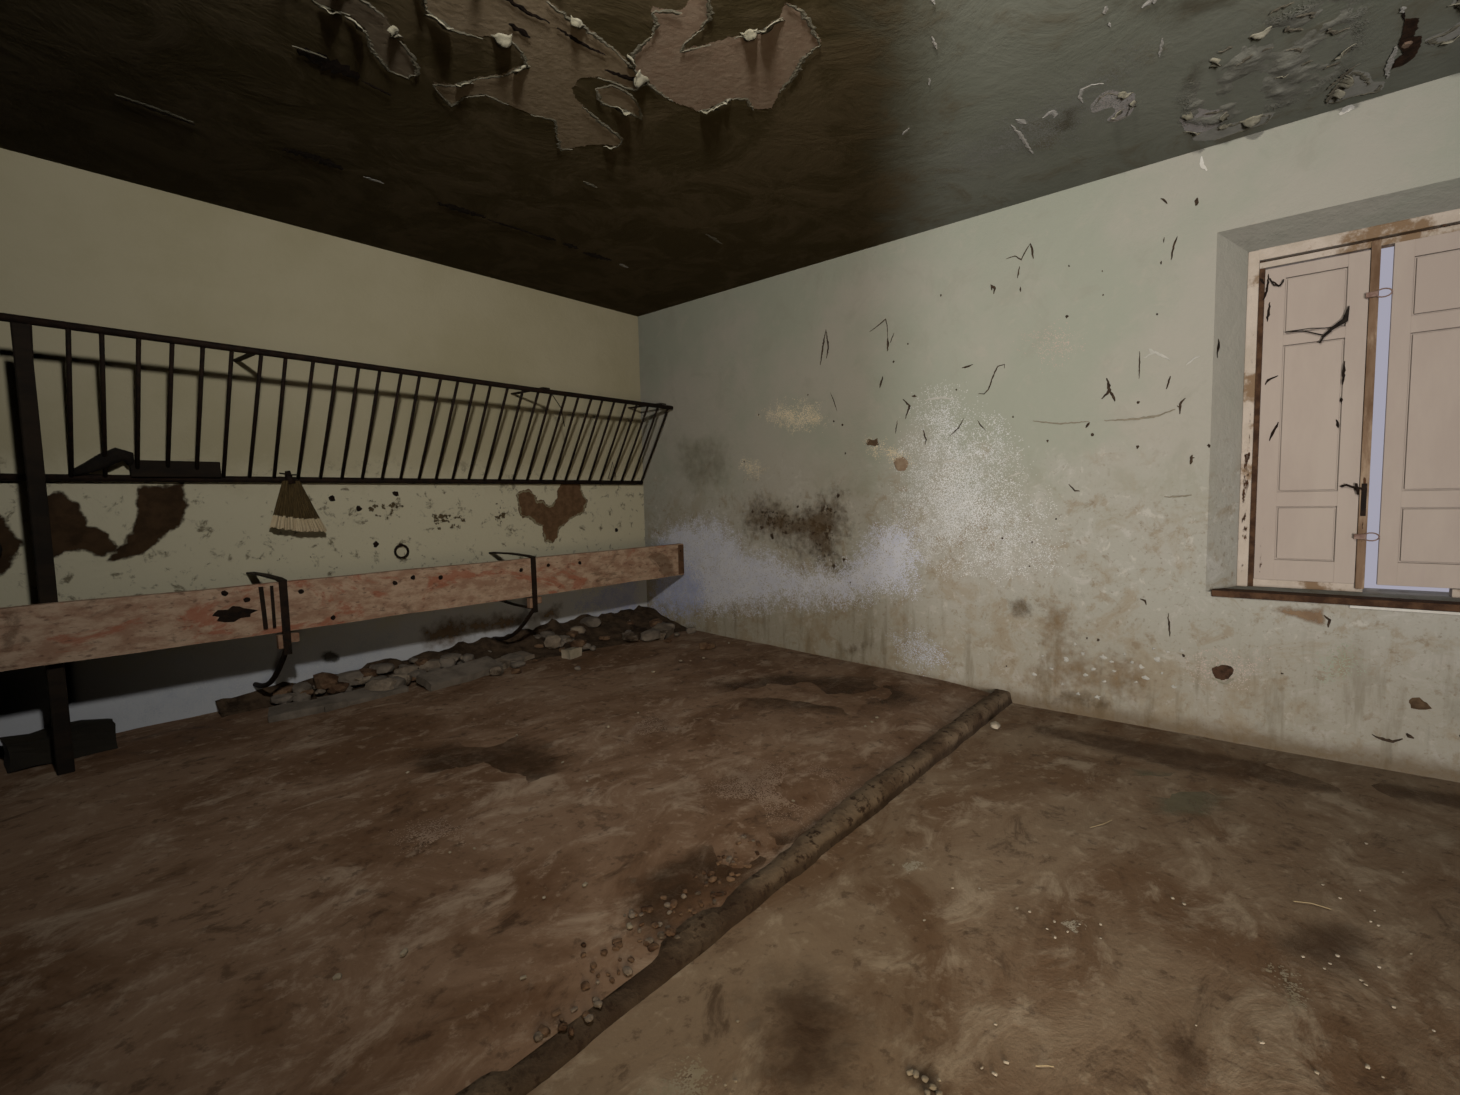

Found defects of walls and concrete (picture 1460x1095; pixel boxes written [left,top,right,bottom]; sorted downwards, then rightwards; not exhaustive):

peeling [1424,0,1460,47]
peeling [311,0,822,151]
peeling [1090,90,1137,122]
peeling [1325,70,1385,115]
peeling [495,484,588,543]
damp [543,382,1067,628]
damp [424,616,521,643]
spalling [1211,665,1234,684]
spalling [1409,697,1432,710]